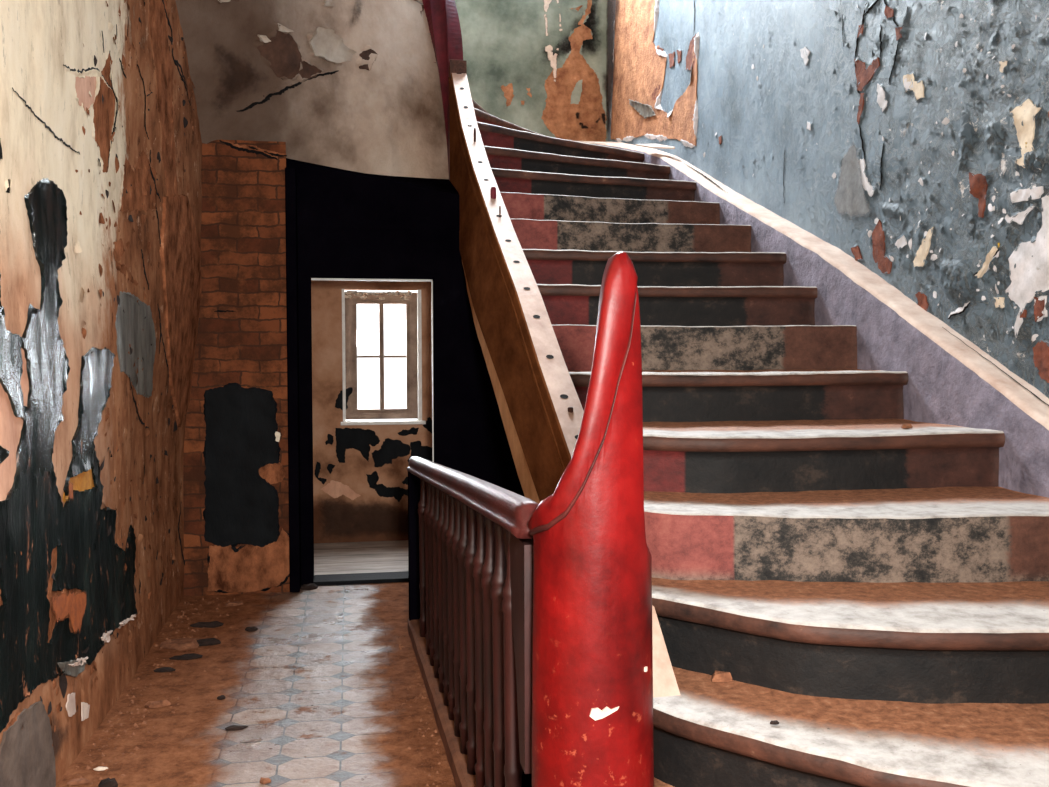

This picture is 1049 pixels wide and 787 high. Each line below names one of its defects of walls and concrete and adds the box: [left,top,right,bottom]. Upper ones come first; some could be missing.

crack [12,87,80,155]
crack [162,0,191,106]
crack [236,69,339,112]
flaking render [254,21,378,83]
flaking render [501,0,723,157]
crack [63,24,169,393]
flaking render [842,0,1049,386]
peeling [0,0,185,787]
crack [129,377,149,428]
peeling [315,417,433,502]
spalling [589,706,619,720]